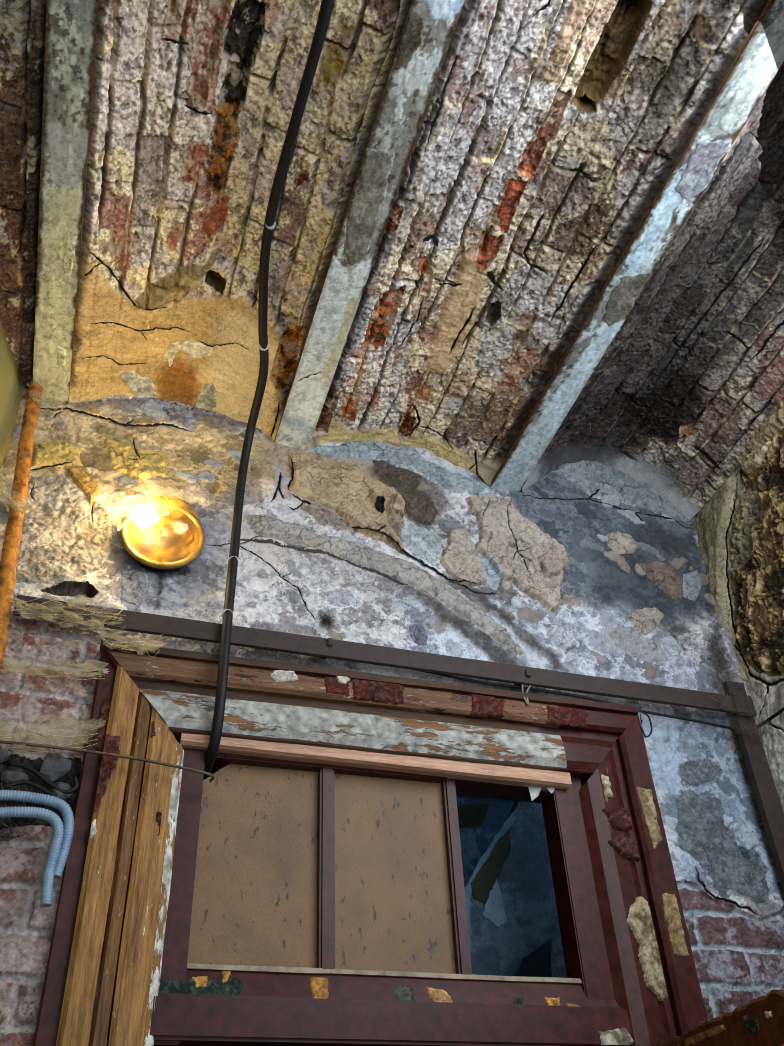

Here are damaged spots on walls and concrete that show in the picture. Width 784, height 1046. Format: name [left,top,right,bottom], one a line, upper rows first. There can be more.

spalling [162,0,266,114]
corrosion [205,100,241,194]
spalling [474,0,652,270]
crack [82,251,250,365]
crack [41,407,189,460]
crack [271,459,311,510]
crack [206,518,496,621]
flaking render [288,383,569,612]
spalling [727,399,784,677]
spalling [0,617,124,1046]
spalling [662,759,784,1035]
crack [696,868,763,916]